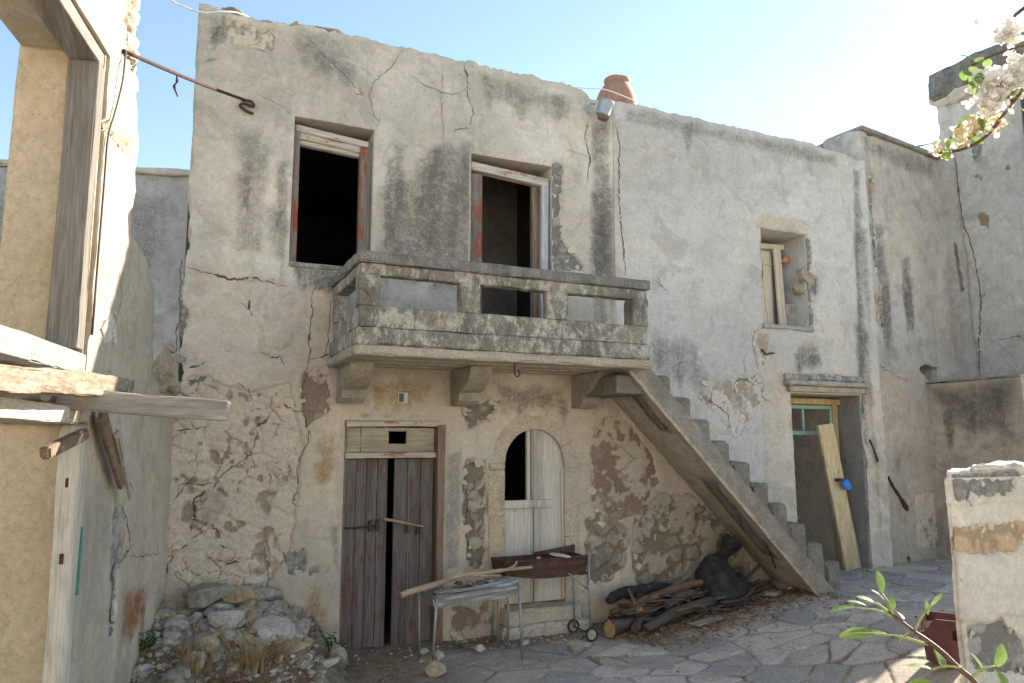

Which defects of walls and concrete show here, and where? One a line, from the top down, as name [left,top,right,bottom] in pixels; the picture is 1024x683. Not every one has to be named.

crack [309,37,474,141]
leakage [389,150,469,260]
spalling [551,163,582,271]
crack [565,124,626,274]
crack [954,157,1023,377]
spalling [693,328,770,439]
crack [109,260,332,633]
spalling [167,366,336,589]
spalling [461,457,487,569]
spalling [584,413,782,589]
spalling [951,471,1021,507]
spalling [953,521,1024,556]